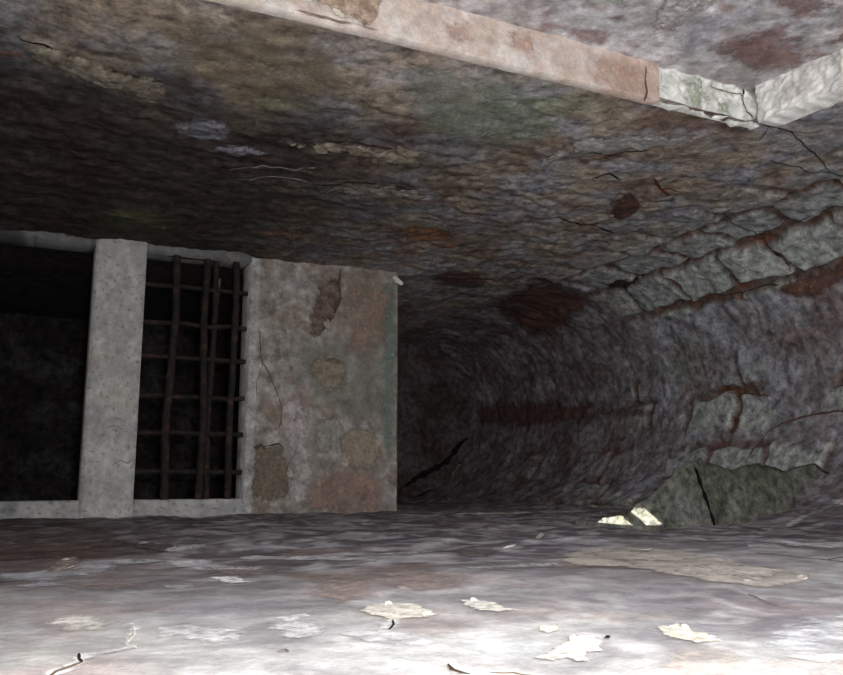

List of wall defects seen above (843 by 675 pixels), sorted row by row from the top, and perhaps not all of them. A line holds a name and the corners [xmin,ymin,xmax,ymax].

spalling [313,0,383,26]
crack [654,178,677,196]
crack [559,217,614,233]
crack [700,206,809,298]
spalling [310,269,342,337]
crack [748,410,843,457]
crack [404,437,468,498]
crack [694,465,715,525]
peeling [561,547,808,587]
spalling [360,601,439,633]
crack [45,623,139,675]
spalling [535,634,610,661]